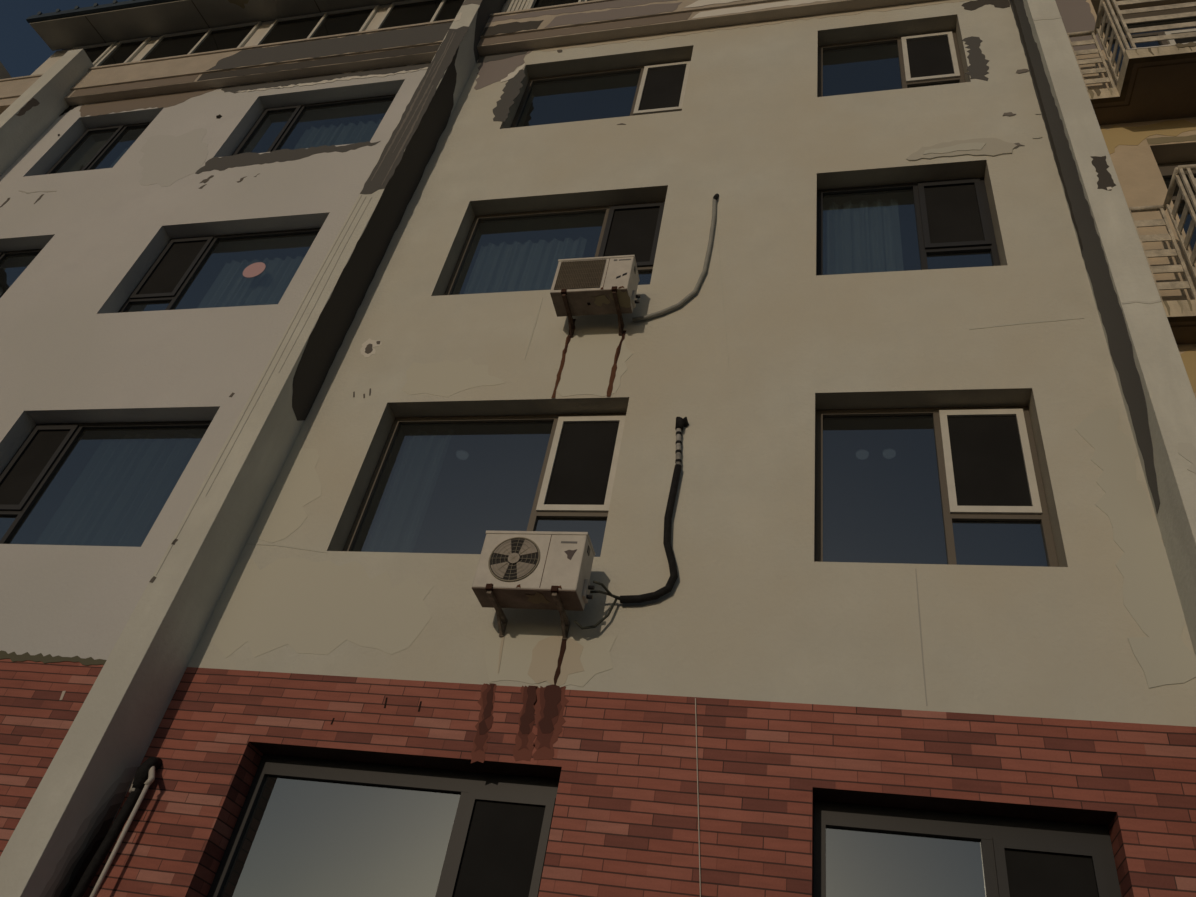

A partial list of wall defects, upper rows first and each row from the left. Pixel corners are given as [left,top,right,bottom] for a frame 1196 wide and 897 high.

flaking render [59,0,830,421]
flaking render [961,0,1160,513]